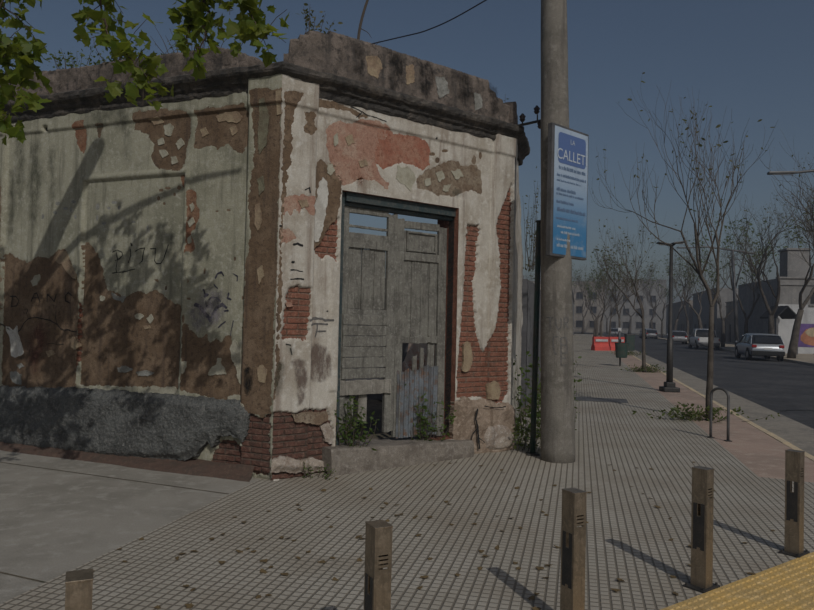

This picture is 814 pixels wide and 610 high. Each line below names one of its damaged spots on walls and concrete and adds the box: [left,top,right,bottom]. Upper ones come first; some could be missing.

peeling [406,64,415,85]
peeling [435,77,449,98]
peeling [0,87,483,481]
spalling [455,188,512,403]